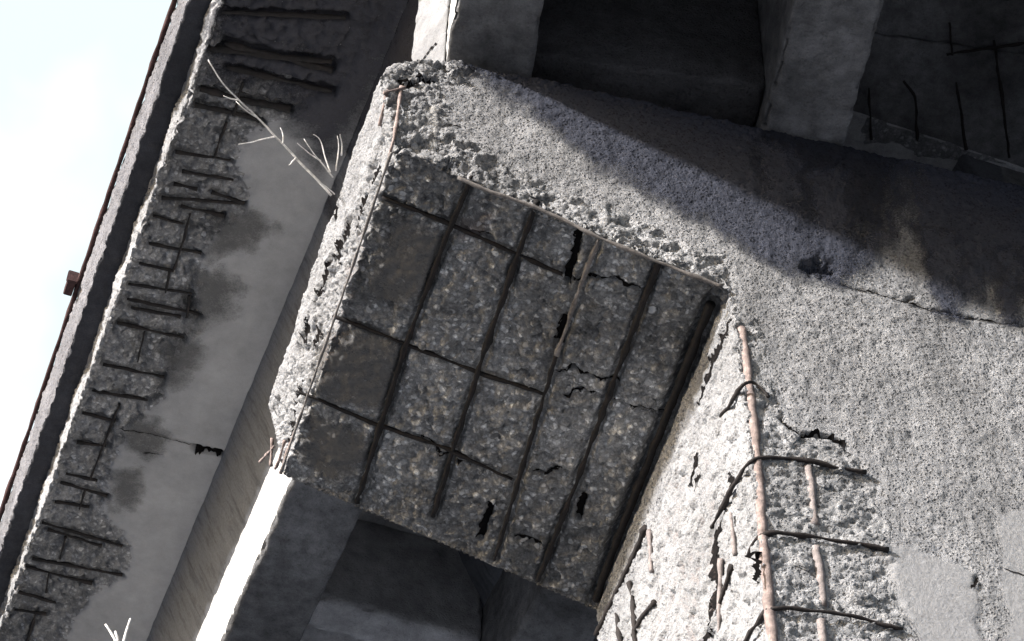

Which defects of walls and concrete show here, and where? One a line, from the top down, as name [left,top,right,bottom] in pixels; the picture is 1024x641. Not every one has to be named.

spalling [0,0,350,641]
damp [157,271,237,389]
spalling [258,59,980,641]
crack [556,363,664,411]
crack [117,428,190,455]
crack [781,414,851,454]
crack [533,465,562,475]
crack [514,534,555,545]